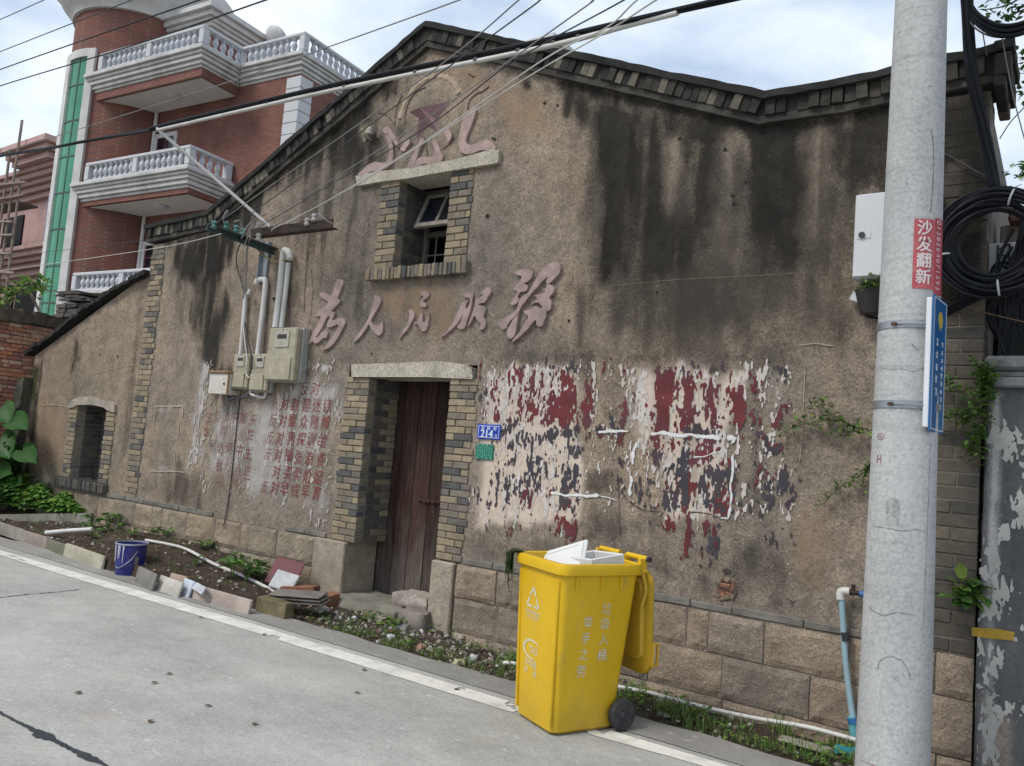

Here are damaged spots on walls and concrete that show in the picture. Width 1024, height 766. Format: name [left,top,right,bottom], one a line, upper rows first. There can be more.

water stain [168,102,382,402]
water stain [558,81,889,361]
peeling [187,354,346,531]
peeling [468,355,802,601]
peeling [978,412,1024,622]
crack [0,711,109,766]
peeling [976,624,1024,766]